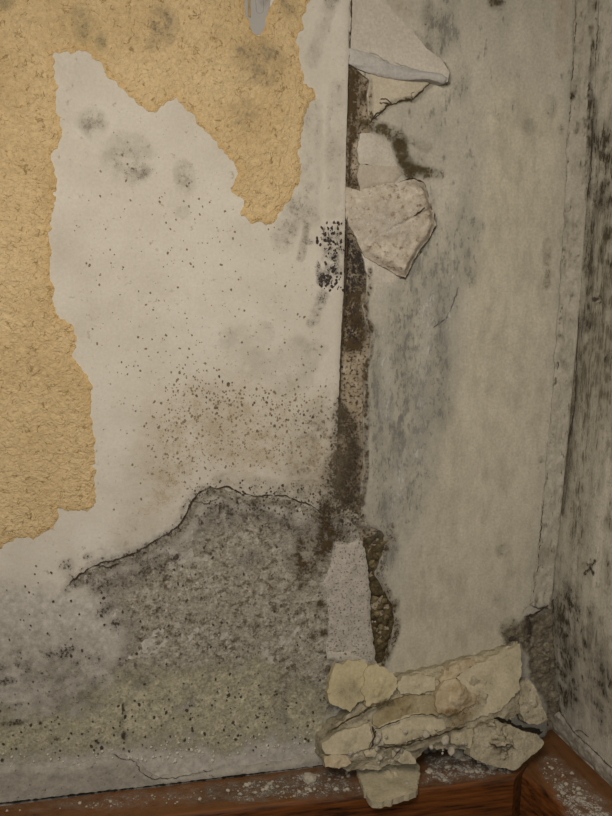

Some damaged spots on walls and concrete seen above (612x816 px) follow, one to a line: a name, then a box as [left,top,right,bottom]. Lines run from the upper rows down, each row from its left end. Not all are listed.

peeling [244,0,270,35]
peeling [348,0,449,125]
peeling [345,164,436,289]
damp [82,546,196,639]
crack [63,486,321,591]
damp [0,638,325,767]
damp [552,587,612,730]